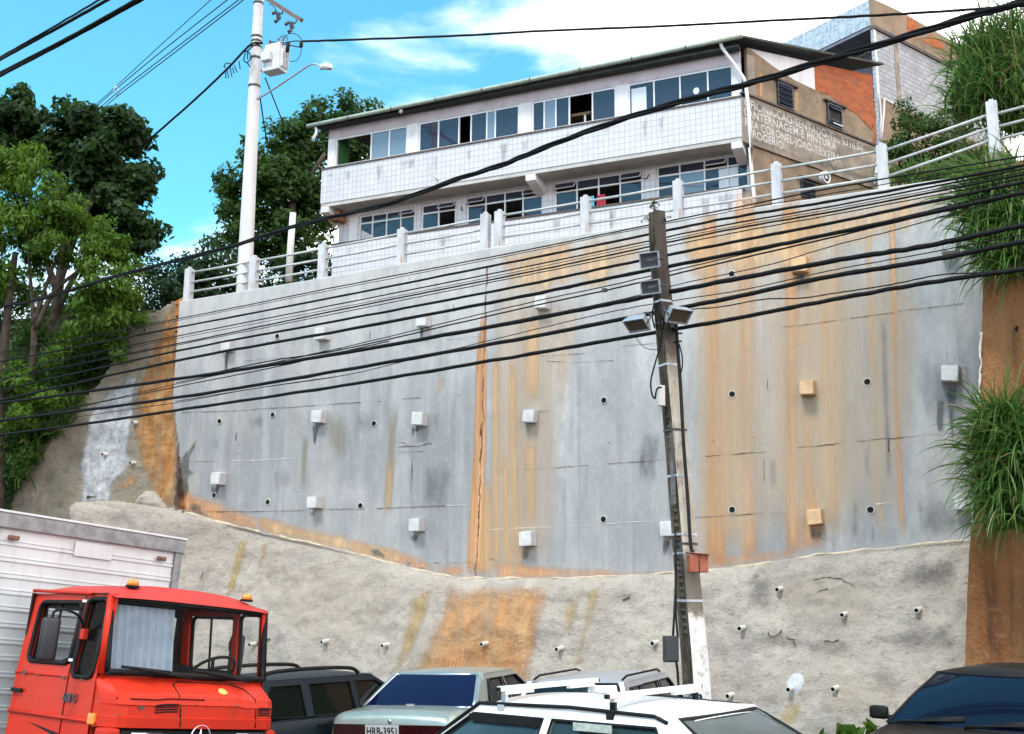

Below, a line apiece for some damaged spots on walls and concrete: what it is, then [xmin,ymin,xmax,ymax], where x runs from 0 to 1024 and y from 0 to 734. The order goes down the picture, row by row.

corrosion [228,542,245,593]
crack [184,402,361,462]
corrosion [138,311,425,567]
crack [293,268,532,576]
corrosion [423,590,542,677]
corrosion [448,321,572,578]
corrosion [690,198,919,564]